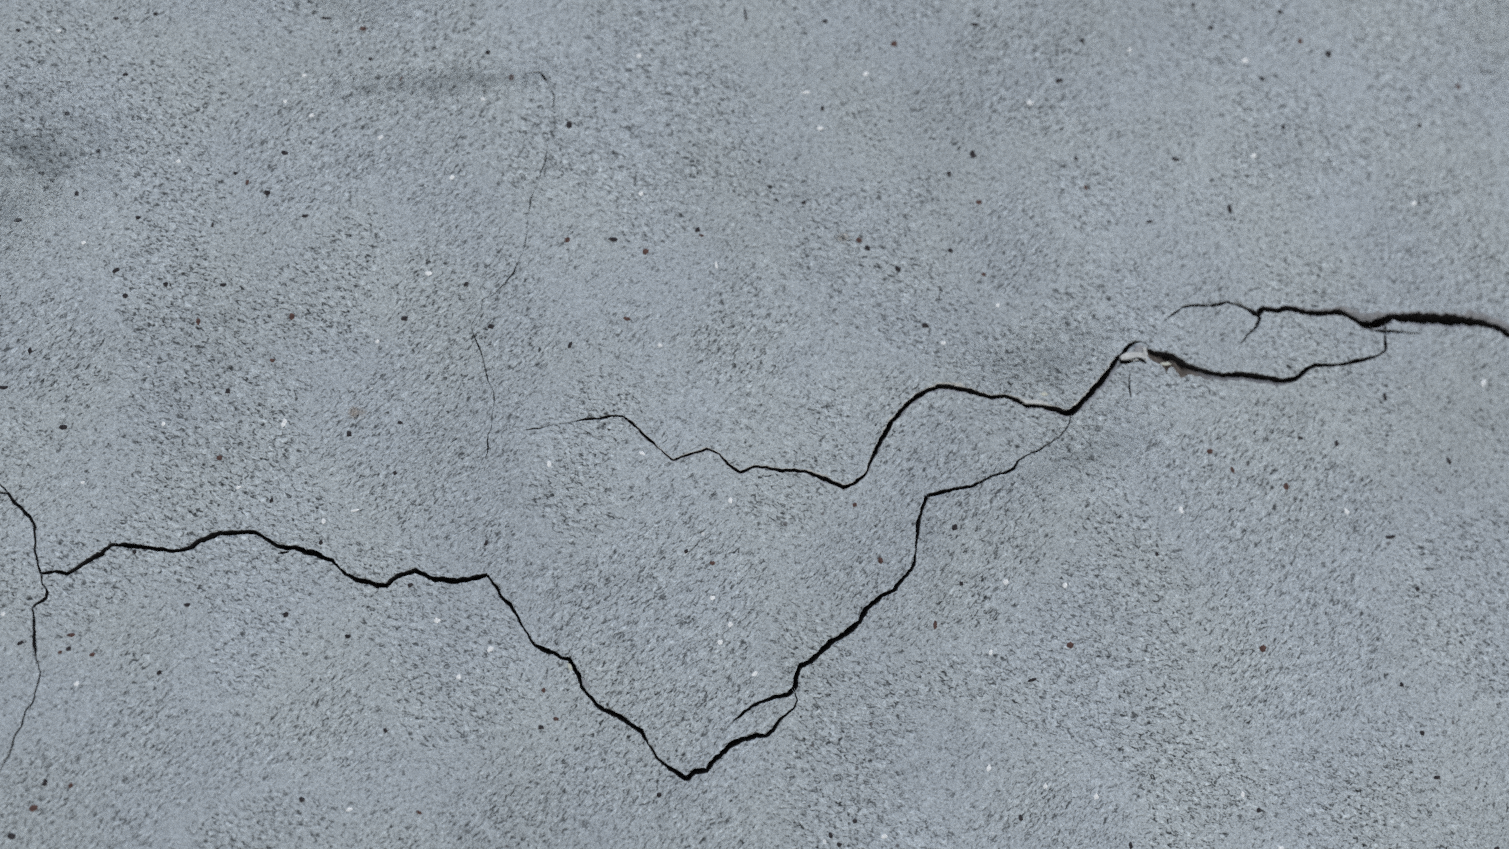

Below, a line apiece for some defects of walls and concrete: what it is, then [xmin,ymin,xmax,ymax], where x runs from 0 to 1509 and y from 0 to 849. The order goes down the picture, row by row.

crack [524,71,555,109]
crack [0,146,1509,781]